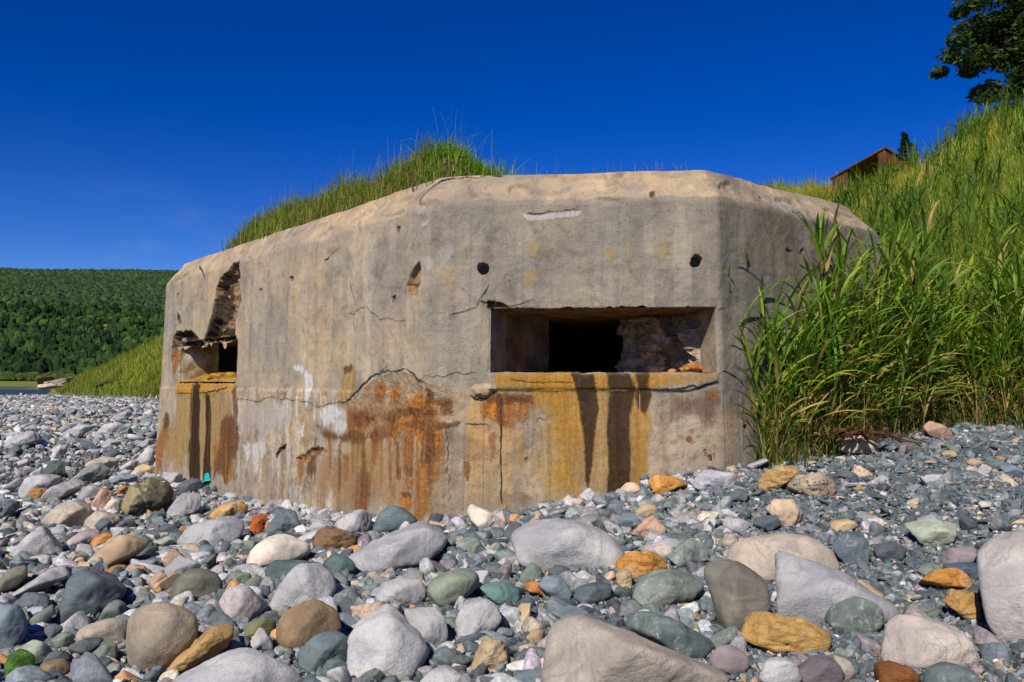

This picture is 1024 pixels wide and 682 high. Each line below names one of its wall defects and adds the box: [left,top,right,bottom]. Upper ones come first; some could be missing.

spalling [171,261,242,362]
spalling [391,262,421,303]
crack [452,284,531,314]
rust [156,414,169,475]
rust [213,386,239,483]
crack [179,365,471,407]
rust [297,364,460,521]
rust [480,393,535,458]
rust [671,388,720,420]